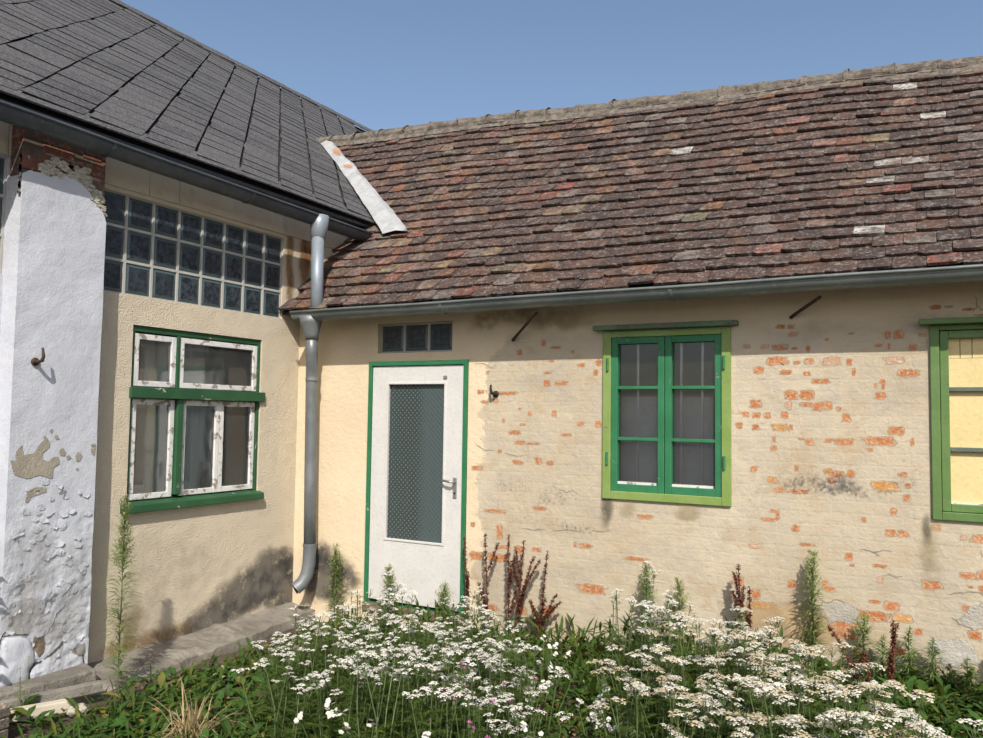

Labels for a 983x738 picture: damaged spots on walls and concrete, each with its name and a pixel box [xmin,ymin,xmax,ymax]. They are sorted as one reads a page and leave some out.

flaking render [17,144,107,217]
spalling [875,330,927,377]
spalling [735,324,915,452]
flaking render [11,429,96,502]
leakage [785,475,865,495]
spalling [871,472,911,502]
spalling [469,509,541,562]
leakage [181,549,294,635]
leakage [306,546,357,599]
spalling [576,583,608,595]
flaking render [33,636,45,657]
spalling [830,600,923,662]